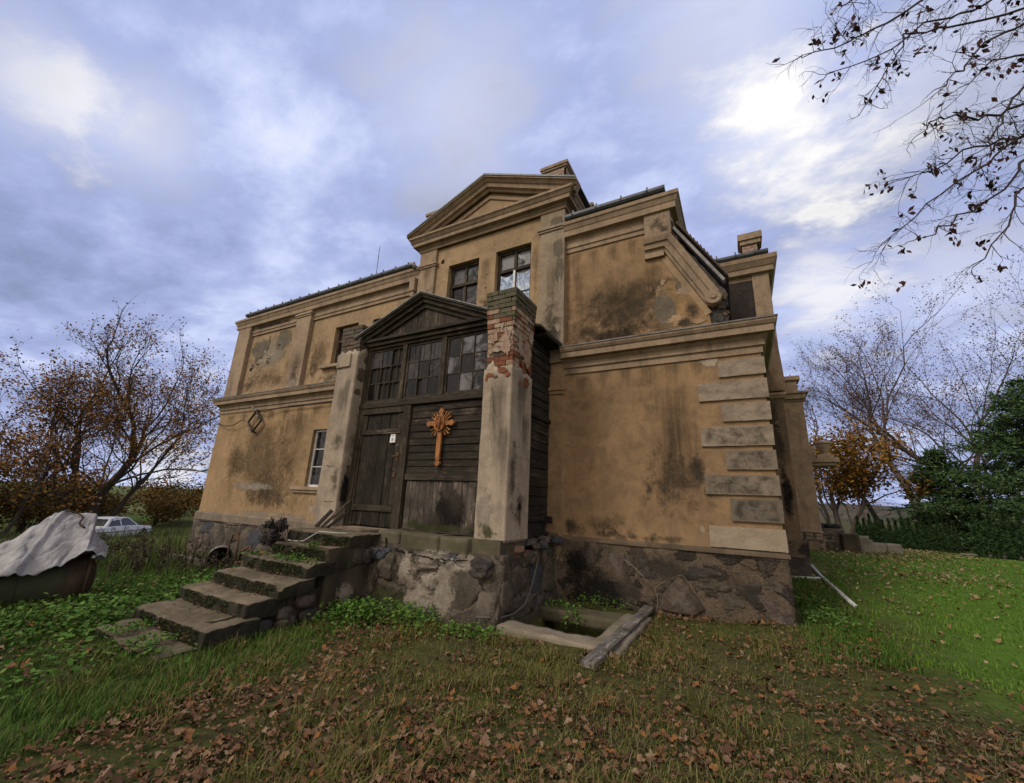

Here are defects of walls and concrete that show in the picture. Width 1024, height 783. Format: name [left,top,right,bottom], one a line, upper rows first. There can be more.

peeling [653,275,730,329]
peeling [248,329,292,378]
peeling [485,322,534,388]
damp [231,450,305,519]